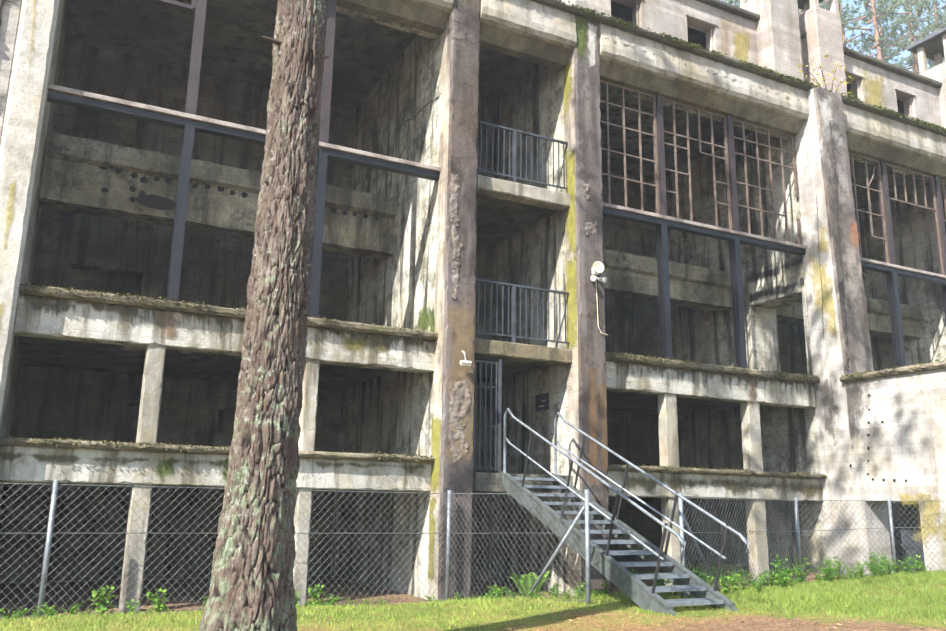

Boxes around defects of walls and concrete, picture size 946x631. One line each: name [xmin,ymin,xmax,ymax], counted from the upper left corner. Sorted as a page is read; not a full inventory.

damp [827,121,850,344]
damp [748,255,804,302]
damp [616,362,748,388]
spalling [448,380,472,462]
damp [780,380,868,438]